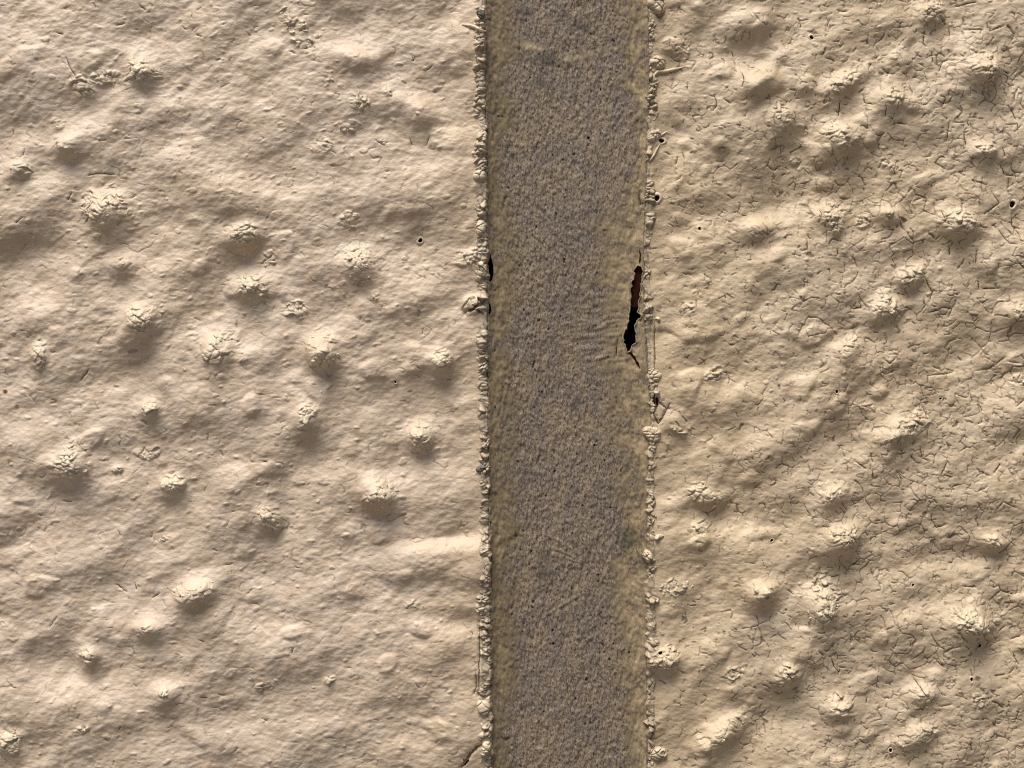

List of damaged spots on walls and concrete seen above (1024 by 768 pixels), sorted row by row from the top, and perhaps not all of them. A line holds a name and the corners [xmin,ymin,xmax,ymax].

crack [838,2,1015,157]
crack [917,72,1024,424]
crack [653,325,670,423]
crack [826,303,895,364]
crack [898,438,951,479]
crack [976,466,1016,525]
crack [910,659,951,718]
crack [959,575,1023,725]